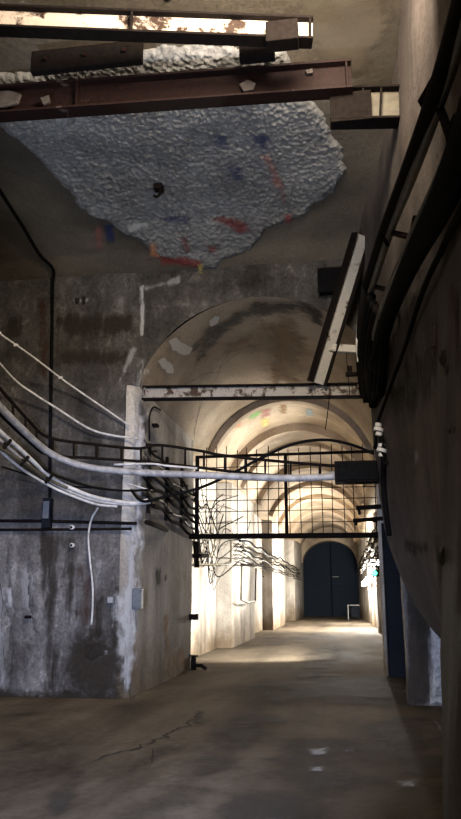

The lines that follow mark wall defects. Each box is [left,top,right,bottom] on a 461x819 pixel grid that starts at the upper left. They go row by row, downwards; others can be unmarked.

leakage [134,392,144,469]
leakage [0,485,143,699]
crack [93,711,204,765]